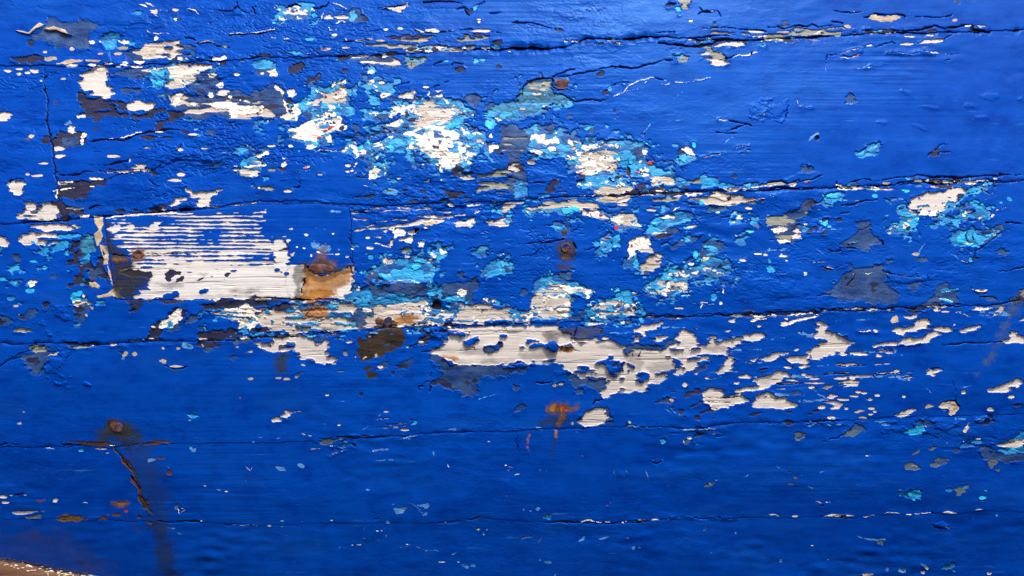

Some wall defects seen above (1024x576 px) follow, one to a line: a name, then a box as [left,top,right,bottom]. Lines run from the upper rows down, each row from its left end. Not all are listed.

crack [185,37,230,48]
crack [764,20,851,71]
crack [901,24,989,37]
crack [44,69,89,201]
peeling [0,0,1024,427]
rust [300,243,353,319]
rust [375,314,418,328]
rust [546,403,578,426]
rust [51,419,172,475]
rust [57,501,152,524]